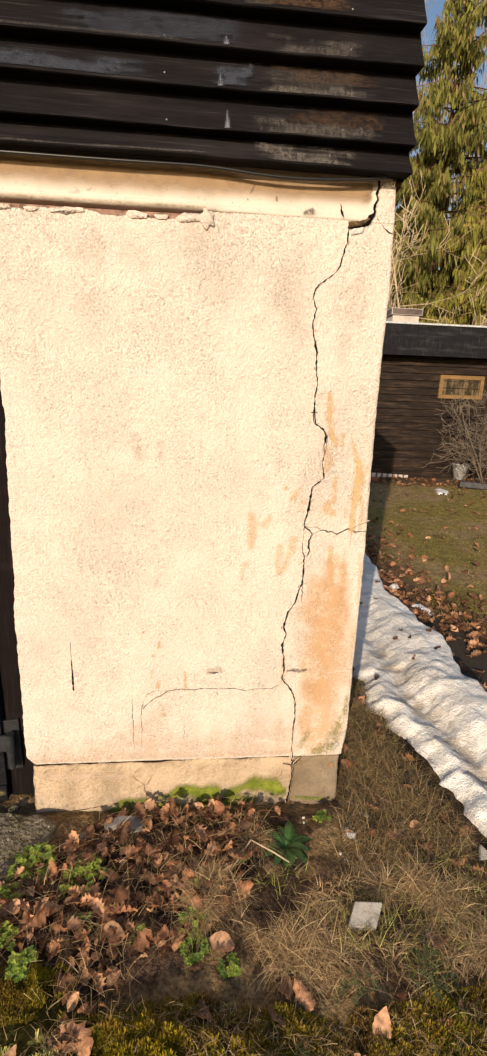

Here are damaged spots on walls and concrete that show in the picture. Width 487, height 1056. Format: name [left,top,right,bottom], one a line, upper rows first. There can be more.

flaking render [0,202,202,223]
crack [131,204,370,803]
crack [71,776,184,811]